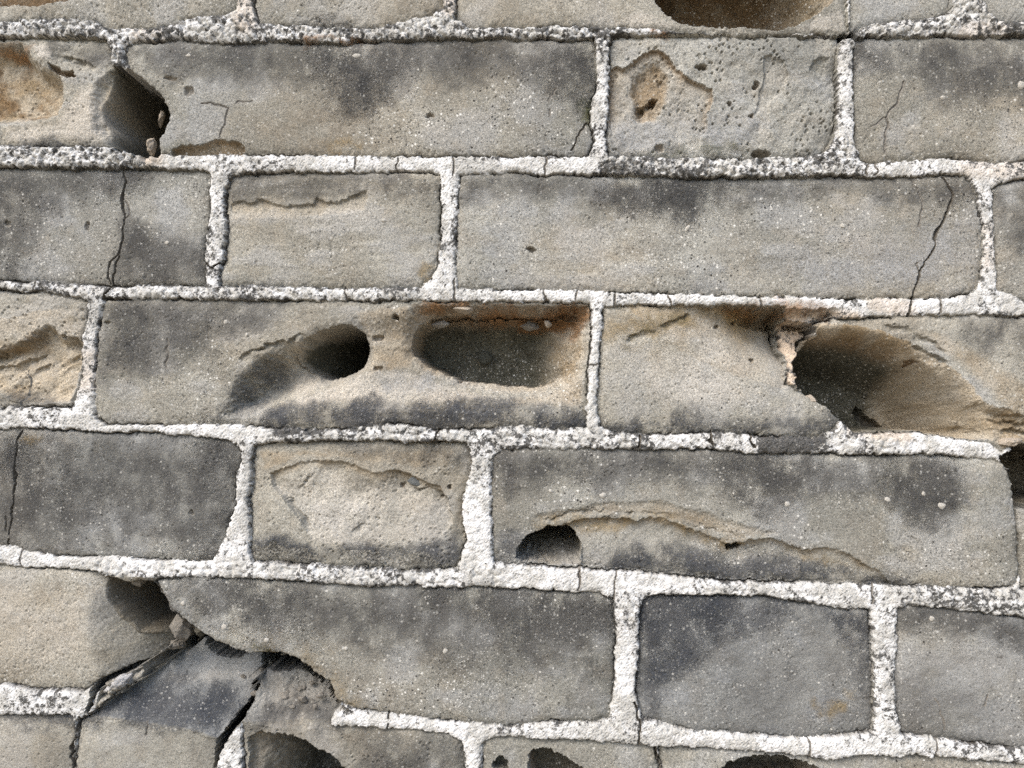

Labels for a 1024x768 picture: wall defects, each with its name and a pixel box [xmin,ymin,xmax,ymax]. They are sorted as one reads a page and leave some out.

spalling [608,49,714,159]
crack [102,167,131,301]
crack [906,174,955,317]
spalling [0,323,84,406]
leakage [209,360,838,436]
spalling [945,399,1024,449]
spalling [562,516,891,585]
crack [69,716,85,768]